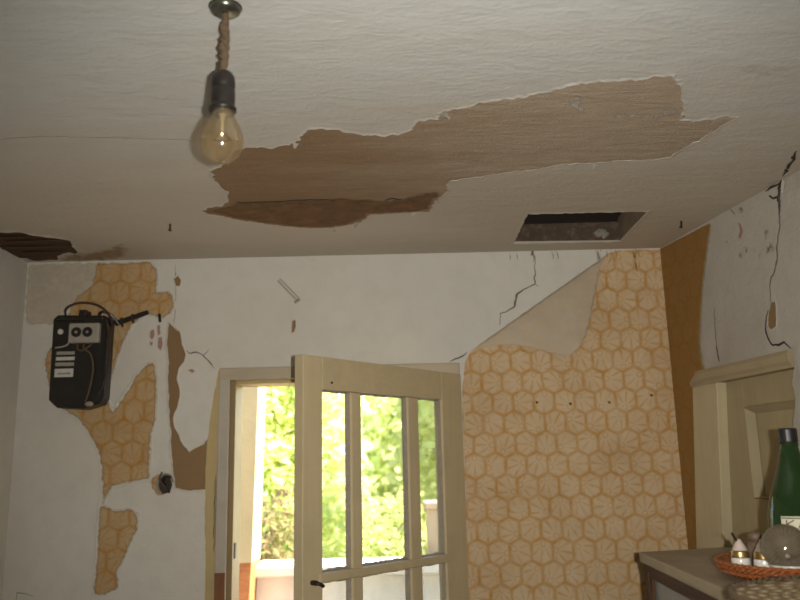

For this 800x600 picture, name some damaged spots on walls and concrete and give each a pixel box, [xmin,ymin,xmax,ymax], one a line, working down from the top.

peeling [200,73,740,232]
crack [499,259,538,324]
crack [765,151,797,349]
peeling [26,262,207,600]